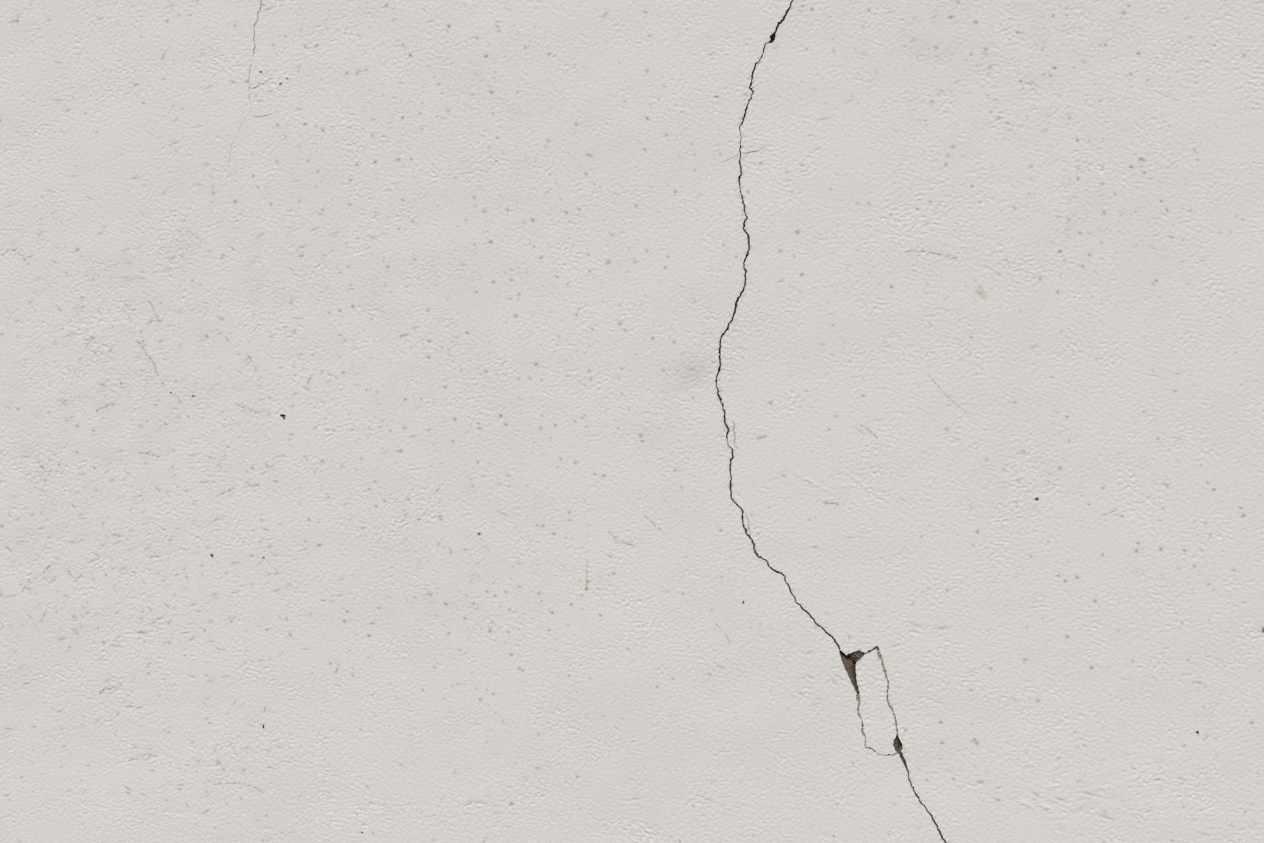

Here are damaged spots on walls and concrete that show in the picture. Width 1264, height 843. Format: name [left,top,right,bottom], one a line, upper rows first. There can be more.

crack [715,0,946,843]